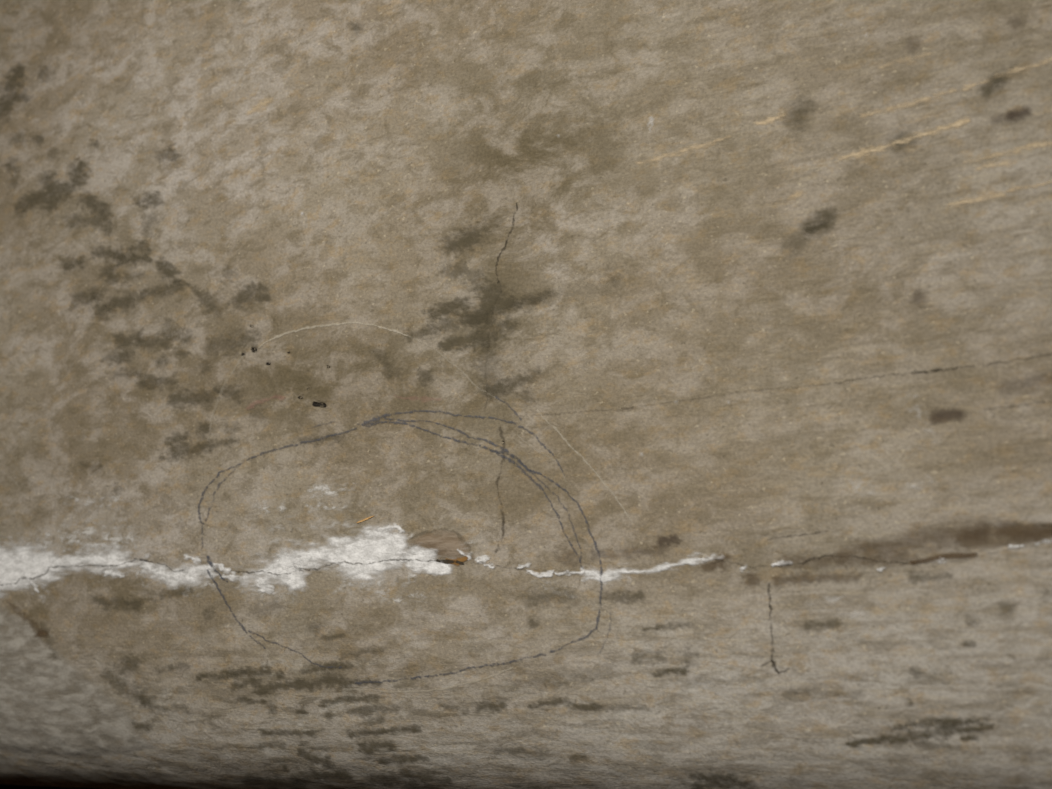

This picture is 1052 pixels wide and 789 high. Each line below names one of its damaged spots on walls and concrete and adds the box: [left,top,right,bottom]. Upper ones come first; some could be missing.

leakage [93,242,176,280]
leakage [429,286,536,350]
leakage [0,524,451,595]
leakage [457,549,494,568]
leakage [517,555,724,582]
leakage [196,663,379,710]
leakage [543,700,598,710]
leakage [846,718,992,747]
leakage [349,727,451,784]